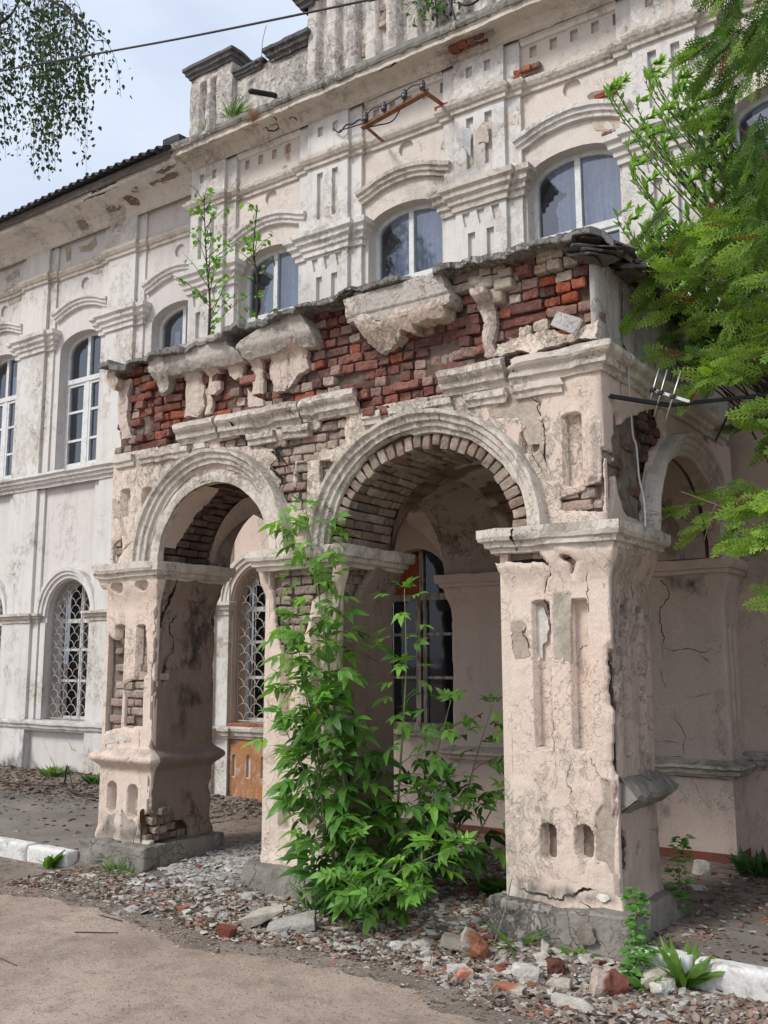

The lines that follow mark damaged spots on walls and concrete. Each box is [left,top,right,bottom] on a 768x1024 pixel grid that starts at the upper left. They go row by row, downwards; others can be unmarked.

spalling [448,29,494,55]
spalling [513,61,542,80]
spalling [115,236,659,454]
spalling [562,409,660,523]
spalling [511,553,546,563]
crack [160,580,178,671]
peeling [509,591,572,663]
crack [659,579,711,685]
spalling [104,633,148,746]
crack [522,887,593,908]